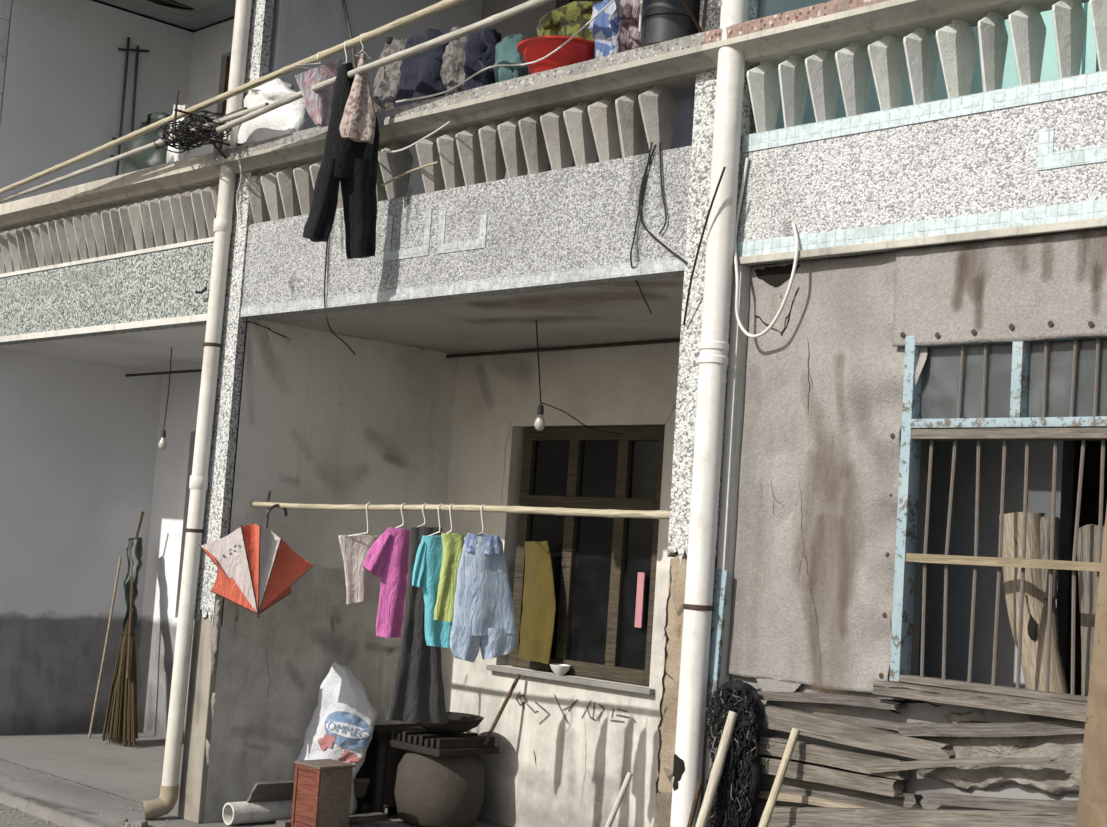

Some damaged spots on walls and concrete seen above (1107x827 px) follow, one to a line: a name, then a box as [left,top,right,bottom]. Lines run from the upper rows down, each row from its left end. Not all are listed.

peeling [755,279,790,332]
crack [771,484,821,665]
spalling [210,599,220,676]